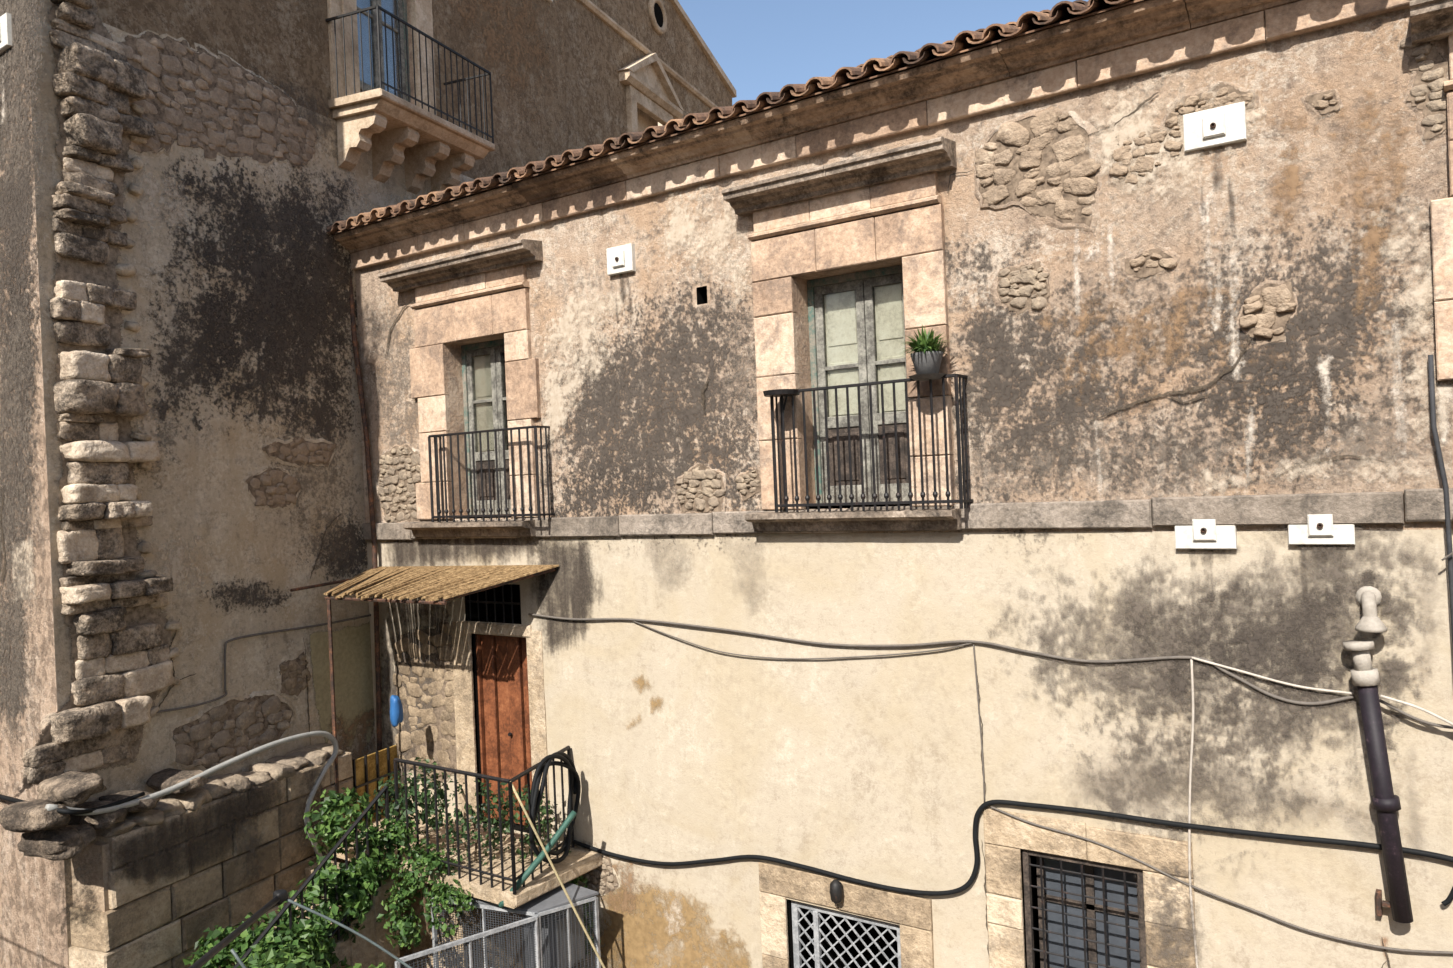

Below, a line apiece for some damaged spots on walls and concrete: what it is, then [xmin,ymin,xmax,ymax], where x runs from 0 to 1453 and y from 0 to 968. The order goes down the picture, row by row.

flaking render [974,81,1264,235]
leakage [0,0,45,744]
spalling [15,0,318,797]
leakage [132,157,418,587]
flaking render [169,617,457,790]
flaking render [376,443,429,523]
leakage [387,534,749,652]
leakage [540,272,767,517]
leakage [945,90,1452,504]
leakage [1027,525,1431,840]
spalling [1234,278,1299,349]
crack [1381,940,1391,968]